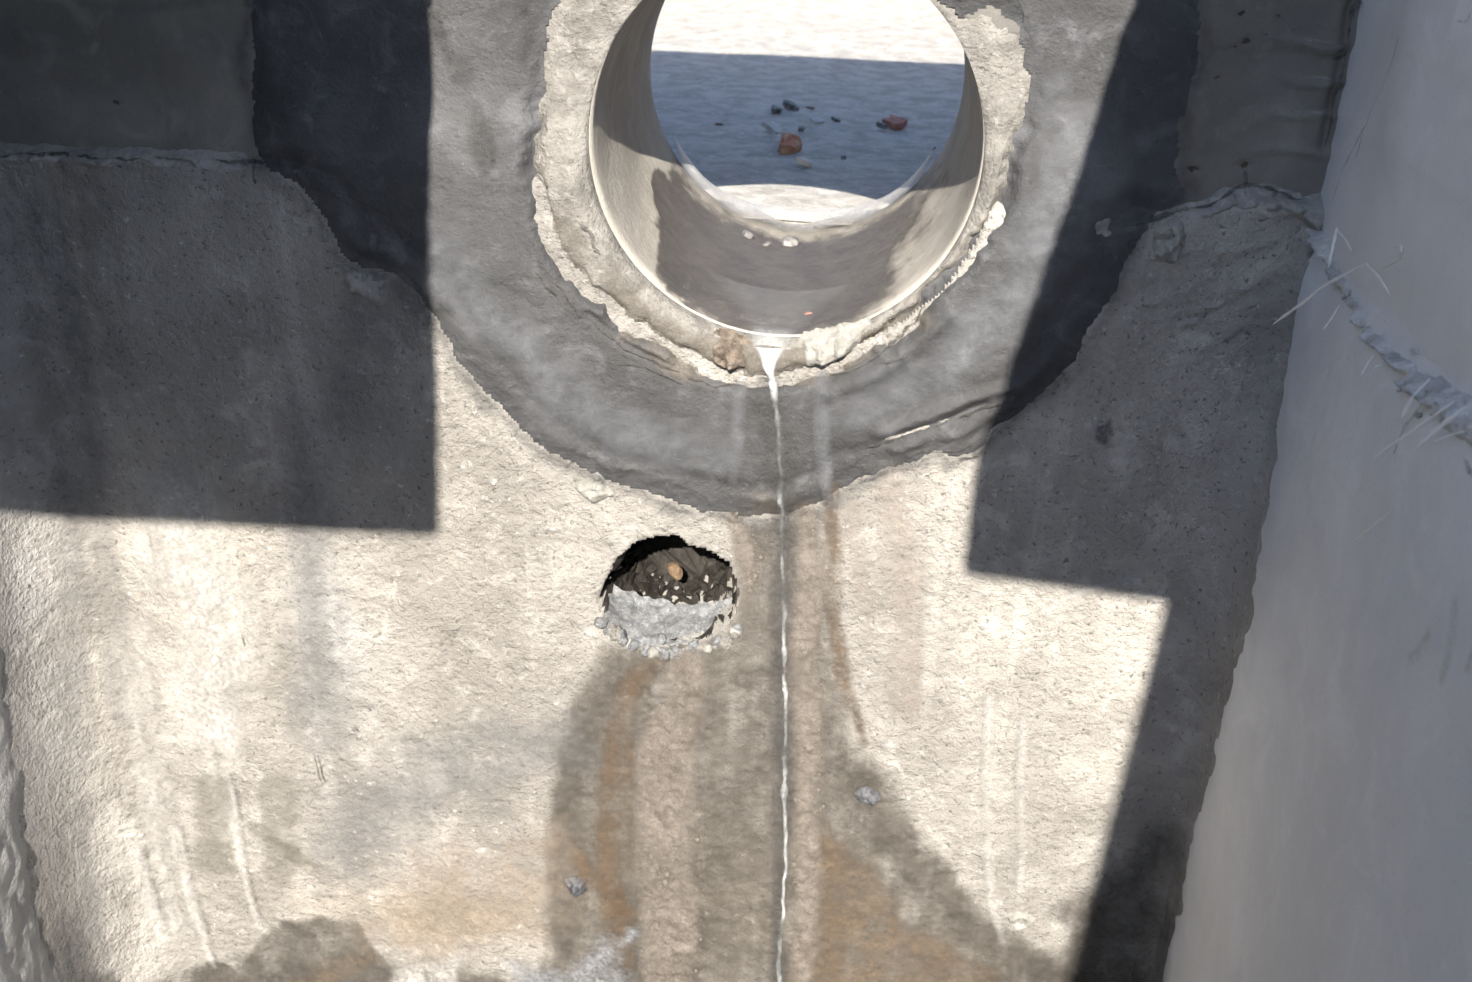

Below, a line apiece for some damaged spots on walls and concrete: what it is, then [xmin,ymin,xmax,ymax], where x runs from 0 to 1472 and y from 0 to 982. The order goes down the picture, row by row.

crack [0,152,181,161]
crack [217,159,323,189]
leakage [150,484,254,752]
spalling [594,511,764,982]
leakage [511,499,1170,982]
leakage [191,918,481,982]